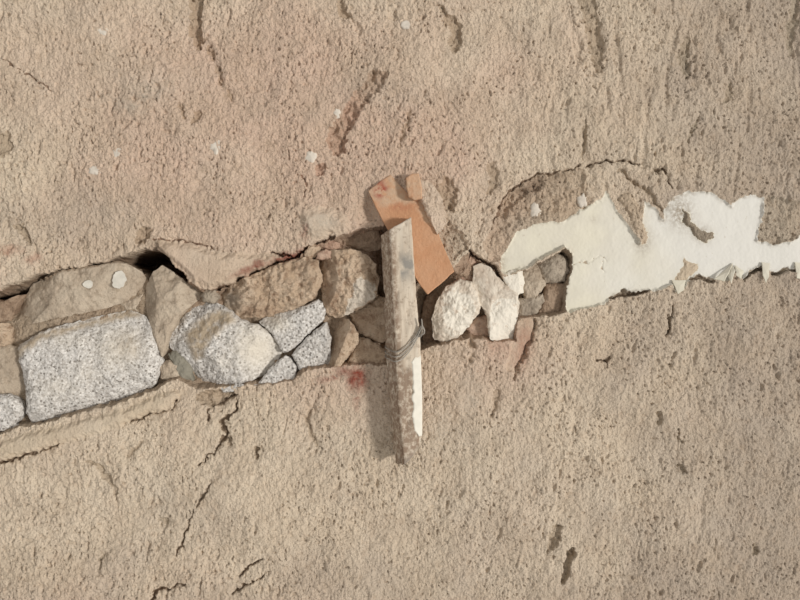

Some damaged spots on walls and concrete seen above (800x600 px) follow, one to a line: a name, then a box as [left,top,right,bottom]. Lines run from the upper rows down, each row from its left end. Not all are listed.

spalling [12,223,32,246]
spalling [135,226,153,245]
crack [491,159,672,230]
peeling [483,120,800,313]
crack [0,226,388,346]
crack [415,249,604,381]
crack [0,288,387,466]
spalling [195,388,236,408]
spalling [304,409,319,448]
spalling [489,389,500,418]
crack [176,484,211,556]